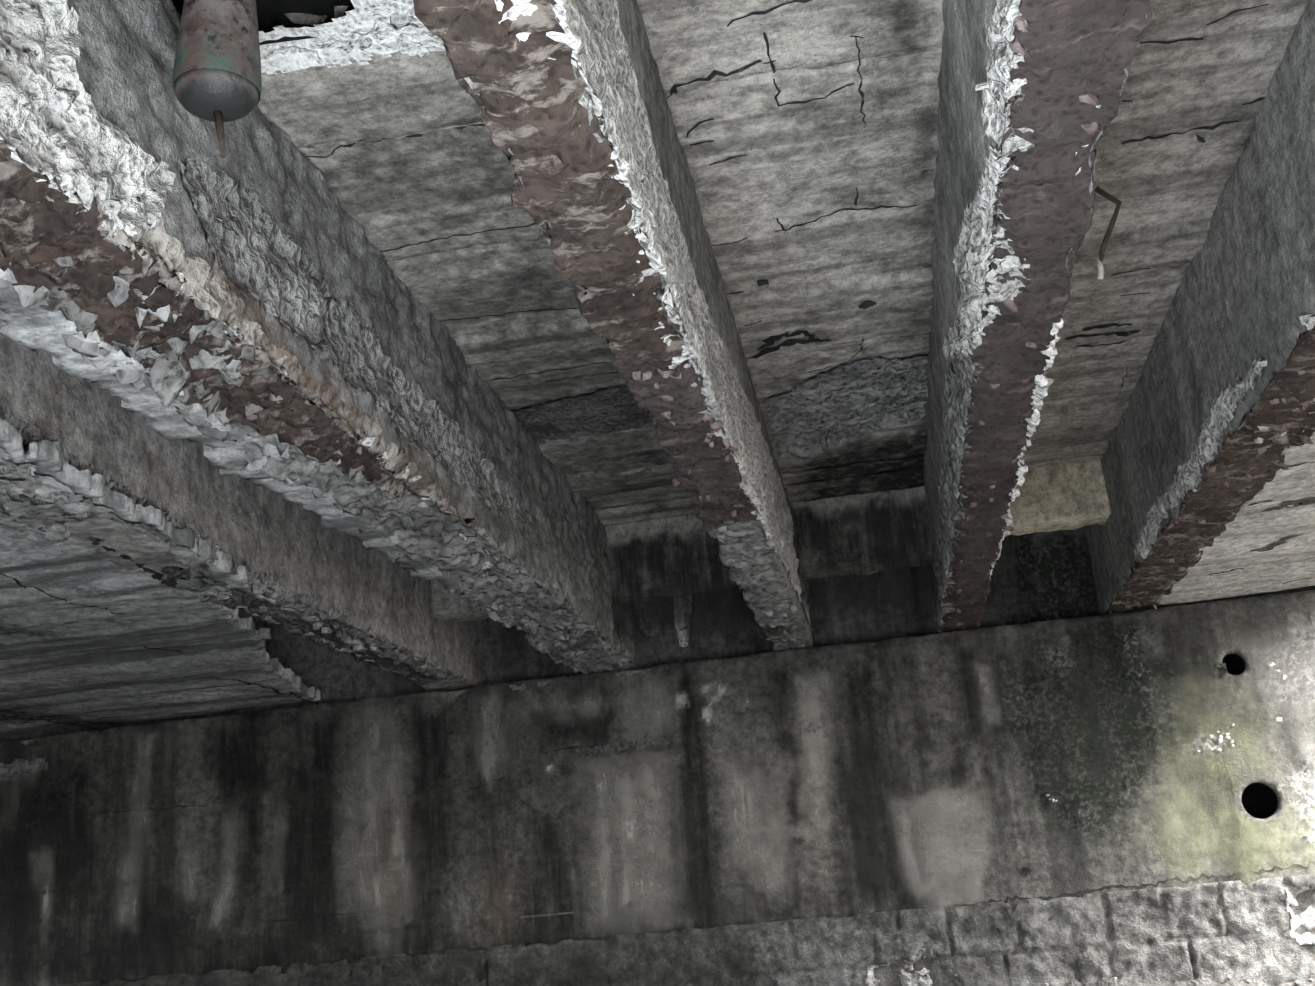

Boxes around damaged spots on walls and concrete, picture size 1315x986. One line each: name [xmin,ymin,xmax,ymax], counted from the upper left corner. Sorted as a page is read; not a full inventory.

spalling [0,0,635,687]
spalling [259,0,1153,652]
crack [666,0,866,128]
crack [745,320,864,373]
crack [713,187,917,246]
crack [1065,268,1150,398]
crack [1121,97,1265,145]
spalling [1105,314,1315,614]
damp [0,724,394,986]
damp [353,714,719,986]
damp [597,678,726,929]
damp [775,671,926,916]